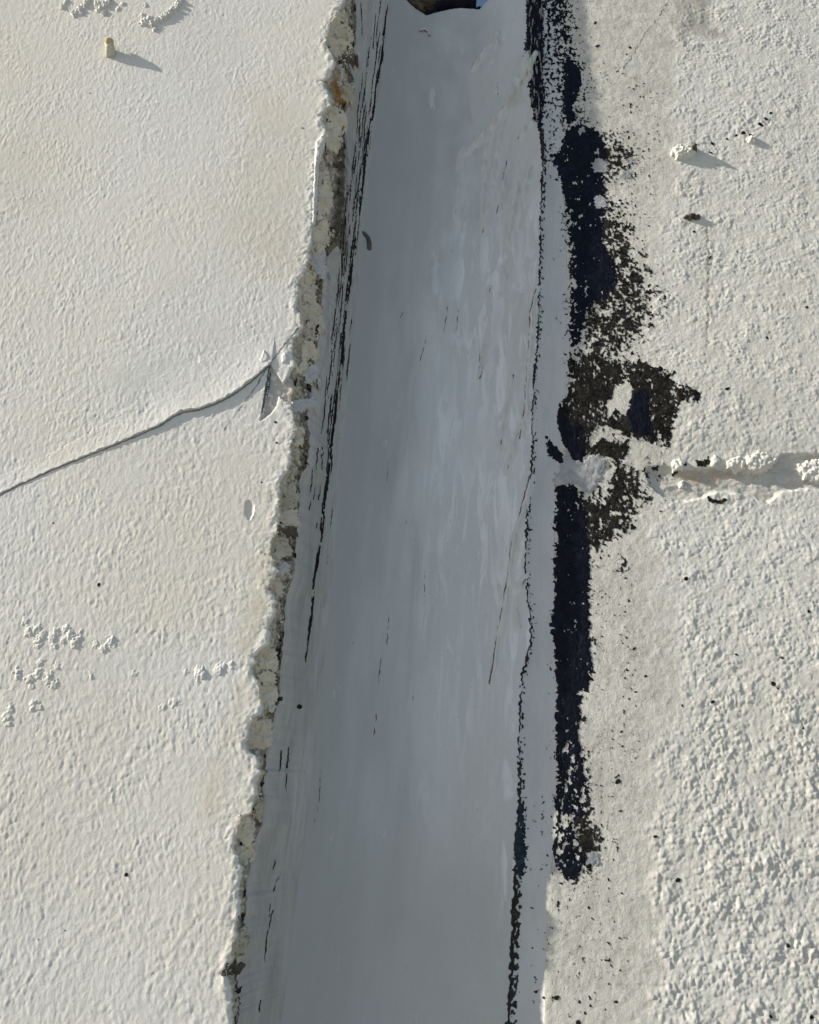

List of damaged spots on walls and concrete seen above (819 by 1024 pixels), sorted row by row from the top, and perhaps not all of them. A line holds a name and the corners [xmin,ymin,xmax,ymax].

crack [0,327,299,496]
spalling [221,0,359,1024]